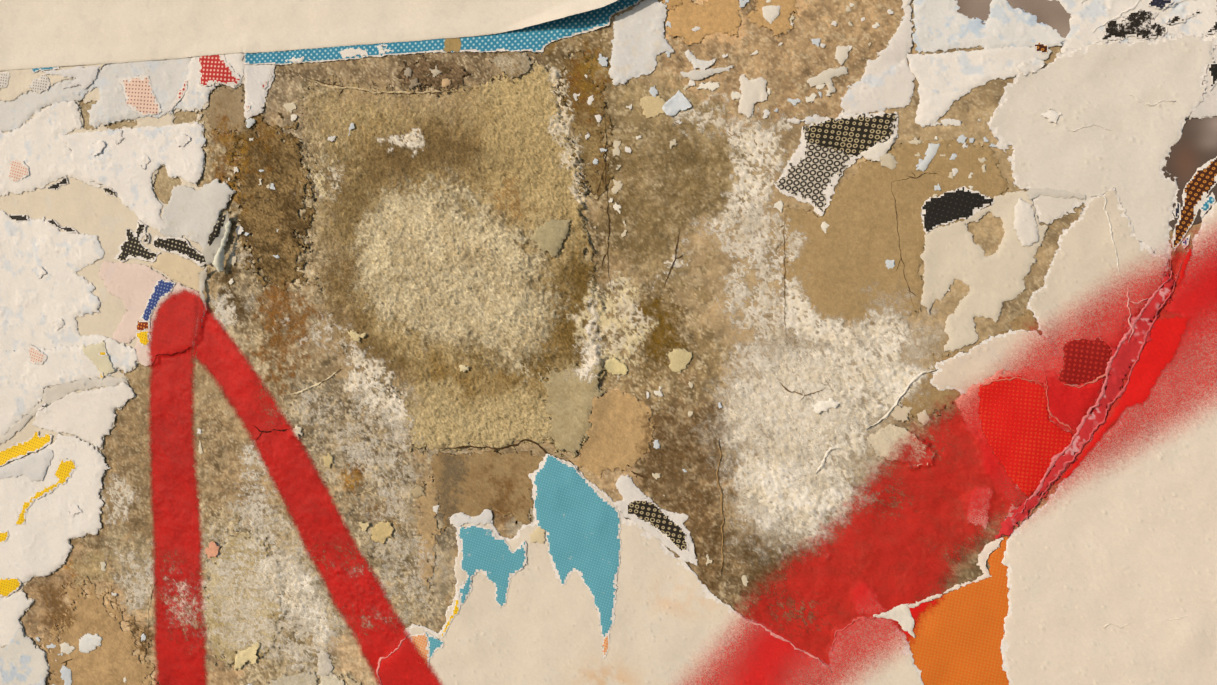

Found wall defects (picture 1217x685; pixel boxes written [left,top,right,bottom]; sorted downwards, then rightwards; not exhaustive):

peeling [658,0,798,46]
water stain [301,154,344,203]
water stain [377,128,425,157]
water stain [546,64,589,204]
peeling [780,136,1010,330]
water stain [657,95,942,593]
crack [436,439,574,465]
peeling [39,575,160,685]
spalling [198,516,289,671]